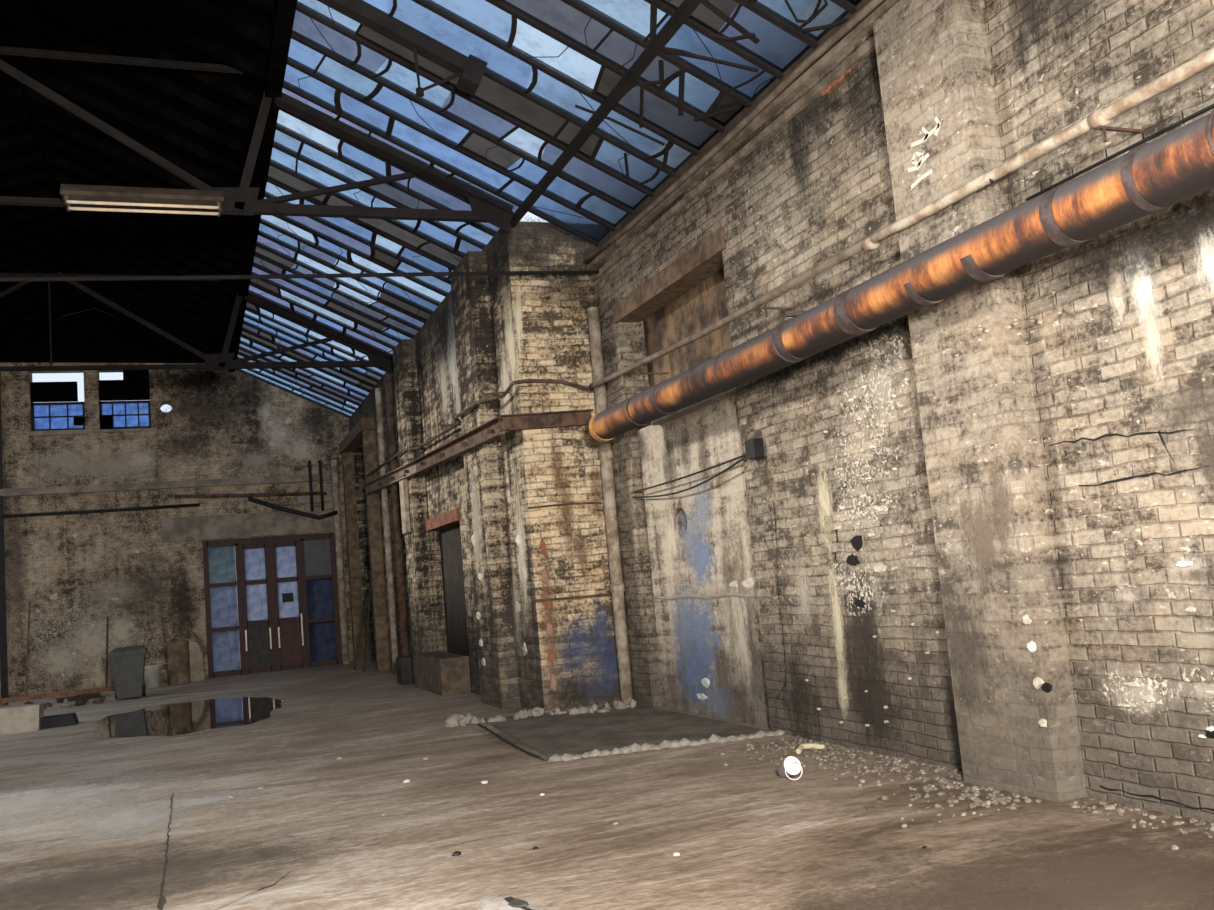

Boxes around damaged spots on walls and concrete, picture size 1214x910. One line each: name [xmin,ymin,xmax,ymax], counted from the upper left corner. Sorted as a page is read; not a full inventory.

leakage [1197,234,1214,291]
leakage [818,474,832,550]
peeling [665,484,756,718]
leakage [790,649,821,736]
leakage [830,571,900,741]
leakage [800,833,1214,910]